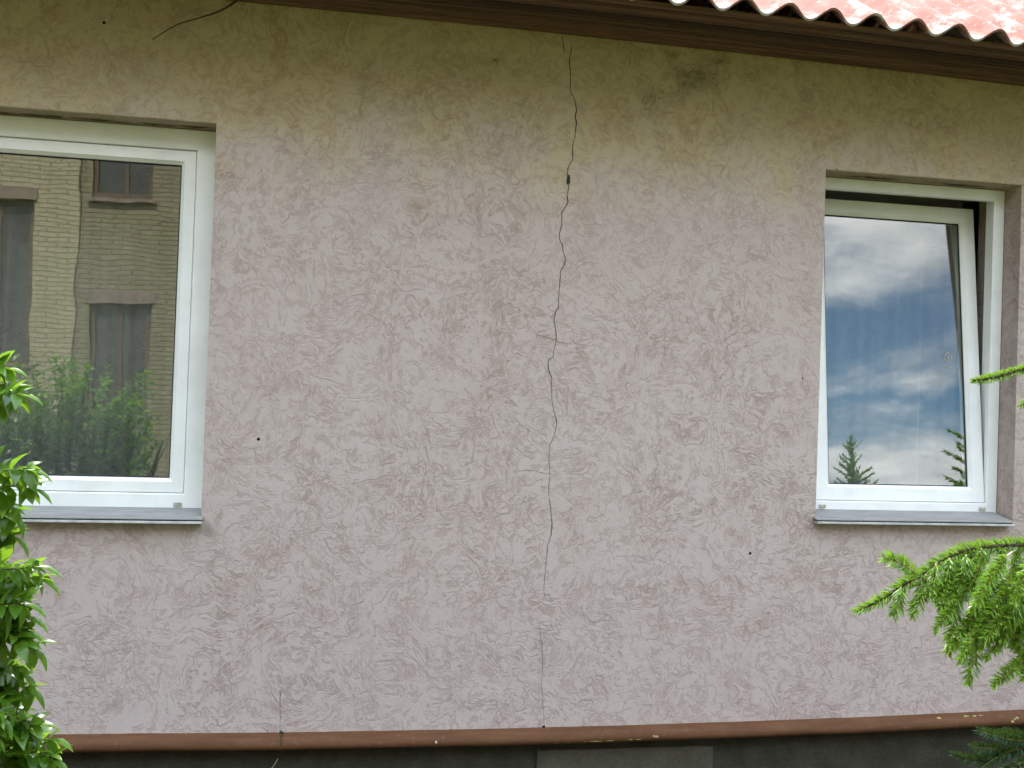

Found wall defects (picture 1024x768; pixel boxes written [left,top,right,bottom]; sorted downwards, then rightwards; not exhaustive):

crack [514,37,580,597]